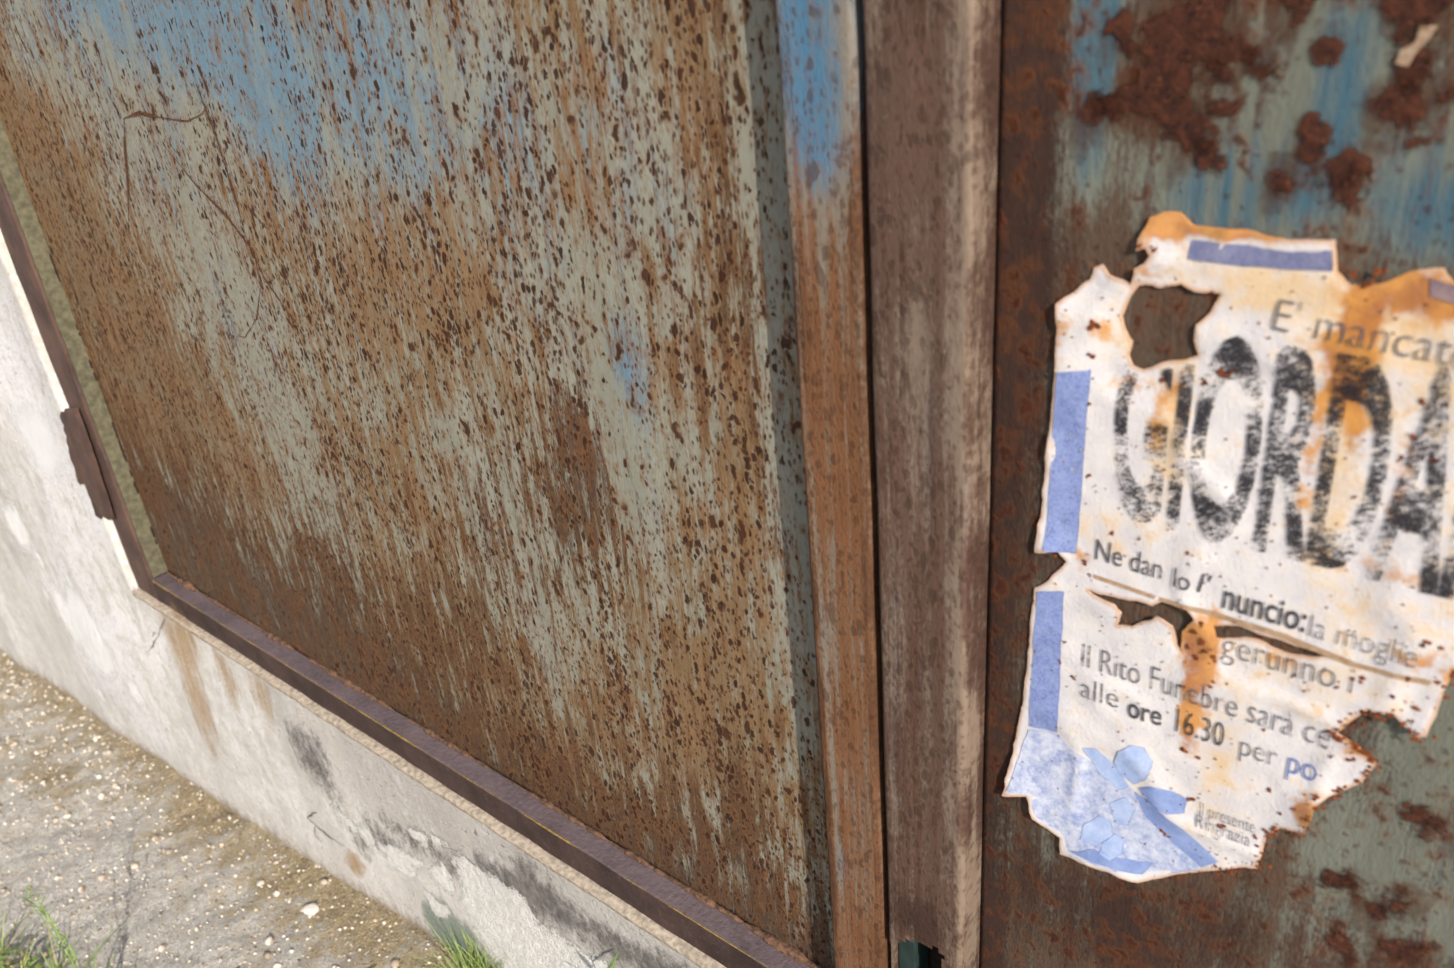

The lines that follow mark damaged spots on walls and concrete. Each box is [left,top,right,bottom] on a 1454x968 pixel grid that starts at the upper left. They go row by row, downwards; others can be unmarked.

rust [1076,0,1286,178]
rust [1280,0,1314,26]
rust [1310,33,1346,67]
rust [1367,0,1454,149]
rust [1269,111,1374,209]
rust [1058,297,1119,338]
rust [1201,367,1236,386]
rust [1184,604,1228,688]
rust [1132,670,1454,876]